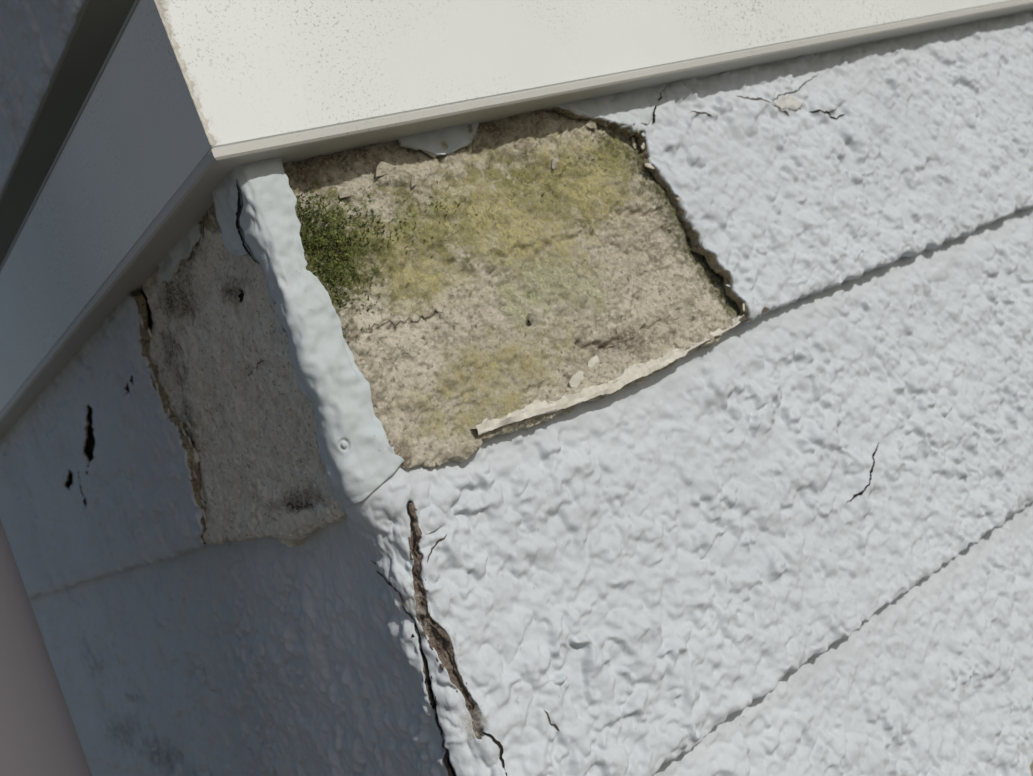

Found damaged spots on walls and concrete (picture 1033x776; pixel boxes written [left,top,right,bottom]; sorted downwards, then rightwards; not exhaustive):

crack [652,92,662,124]
crack [739,76,845,119]
spalling [133,204,346,548]
spalling [282,83,769,469]
crack [846,443,879,503]
crack [373,501,507,776]